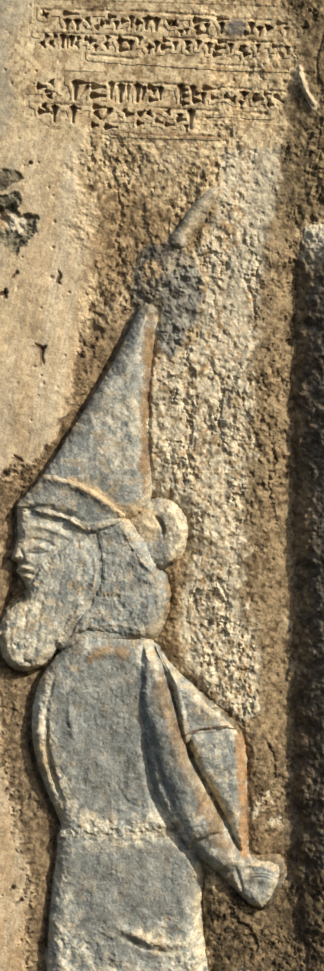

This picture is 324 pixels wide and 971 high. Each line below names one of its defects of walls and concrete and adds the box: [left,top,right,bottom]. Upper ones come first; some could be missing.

spalling [0,169,38,254]
crack [183,725,229,736]